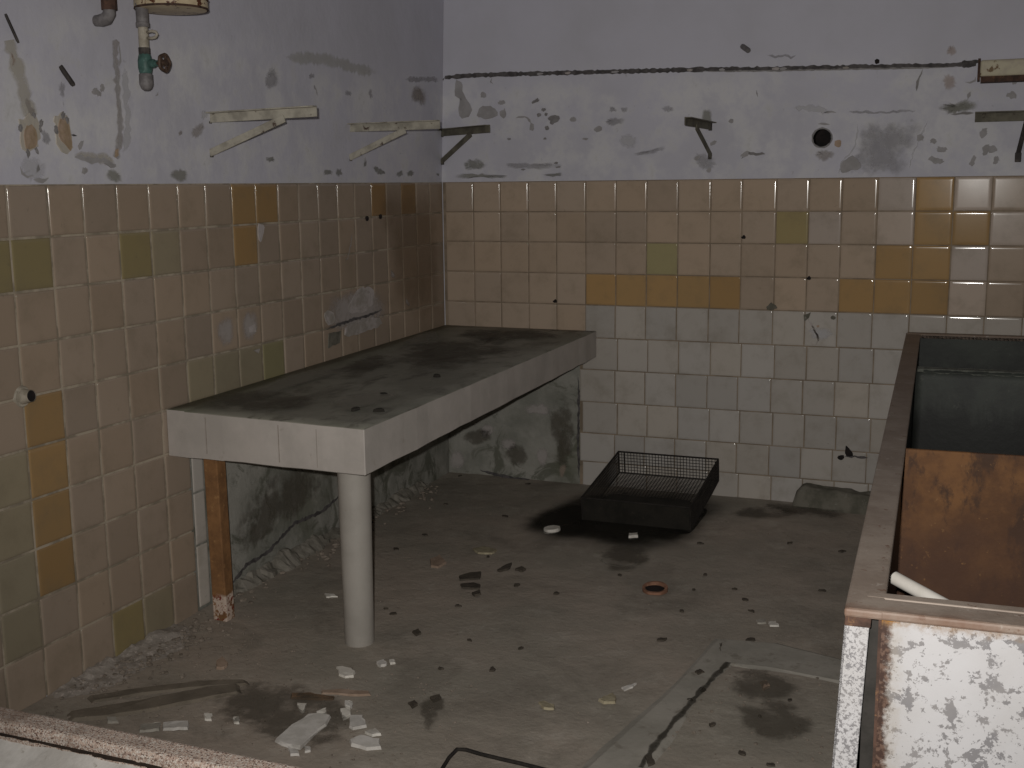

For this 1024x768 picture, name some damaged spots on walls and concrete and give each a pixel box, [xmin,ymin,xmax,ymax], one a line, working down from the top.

peeling [455,80,576,140]
spalling [18,111,84,183]
spalling [324,286,382,348]
leakage [740,671,808,737]